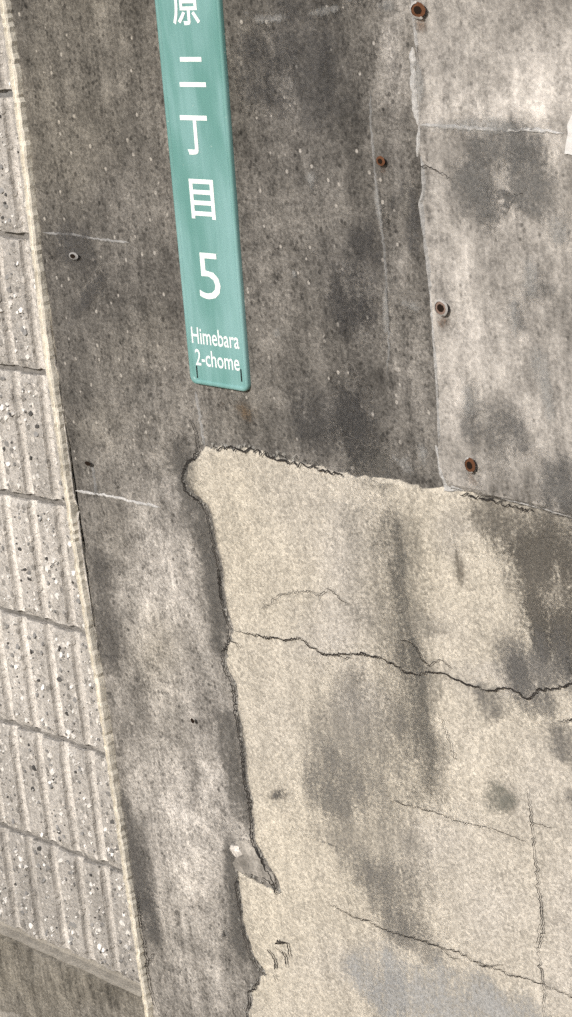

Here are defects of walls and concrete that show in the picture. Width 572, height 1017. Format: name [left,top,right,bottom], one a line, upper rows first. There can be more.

leakage [452,121,555,221]
crack [234,876,290,1017]
crack [181,418,572,895]
peeling [183,441,572,1017]
crack [327,792,572,1017]
leakage [490,783,516,810]
leakage [471,461,572,716]
leakage [550,727,569,760]